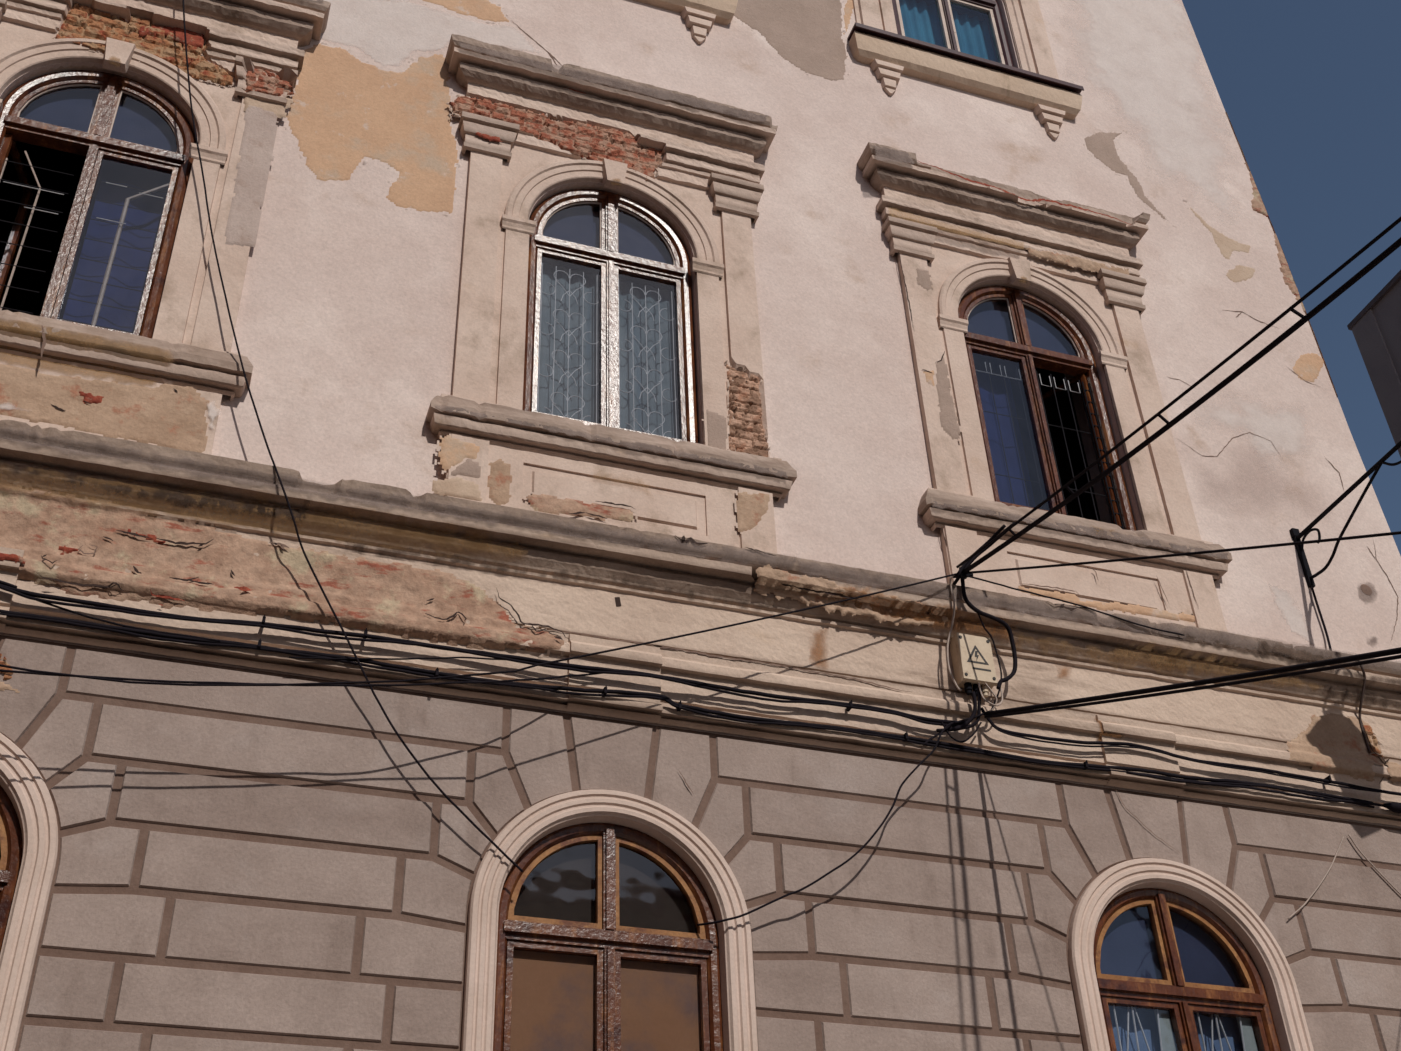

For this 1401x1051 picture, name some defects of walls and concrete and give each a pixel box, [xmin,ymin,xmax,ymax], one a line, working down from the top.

flaking render [734,0,854,81]
peeling [55,0,663,247]
flaking render [1083,130,1177,228]
flaking render [1226,112,1338,397]
flaking render [0,364,209,453]
flaking render [702,360,770,458]
flaking render [432,434,638,524]
flaking render [734,490,770,534]
crack [36,530,252,606]
flaking render [0,483,564,659]
damp [0,429,1401,708]
flaking render [1287,713,1401,784]